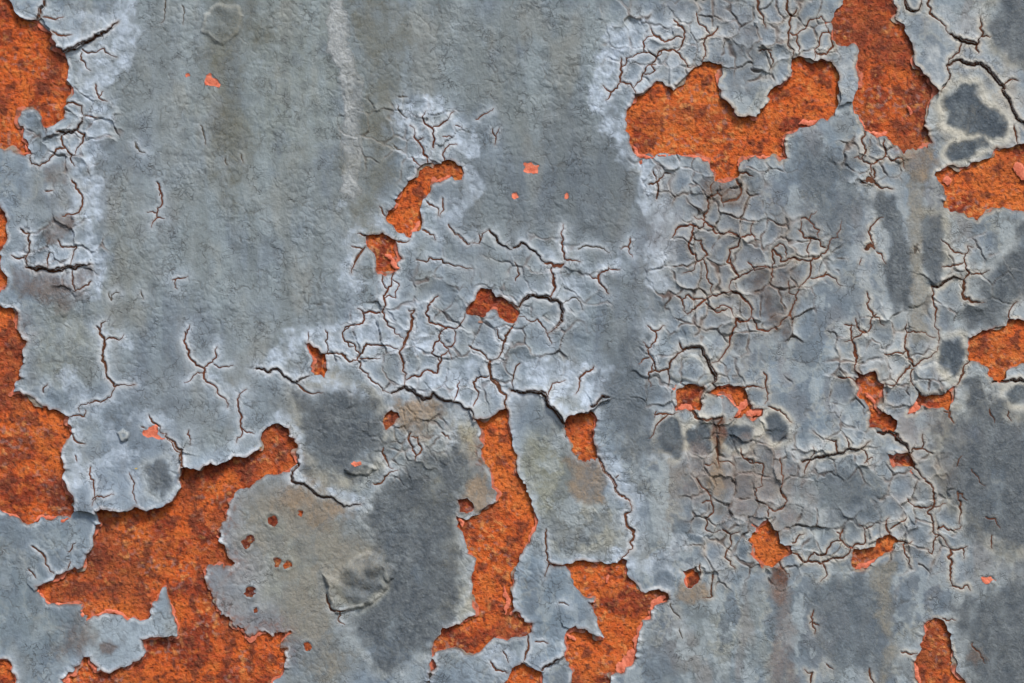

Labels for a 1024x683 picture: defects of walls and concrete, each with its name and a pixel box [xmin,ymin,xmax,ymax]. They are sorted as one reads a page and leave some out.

peeling [0,0,118,156]
crack [11,0,143,505]
crack [308,198,633,437]
crack [639,171,842,388]
peeling [625,0,949,181]
peeling [935,144,1024,220]
peeling [0,305,298,683]
rust [241,535,255,549]
rust [244,587,258,613]
rust [273,557,292,569]
peeling [430,367,669,683]
crack [650,410,1000,598]